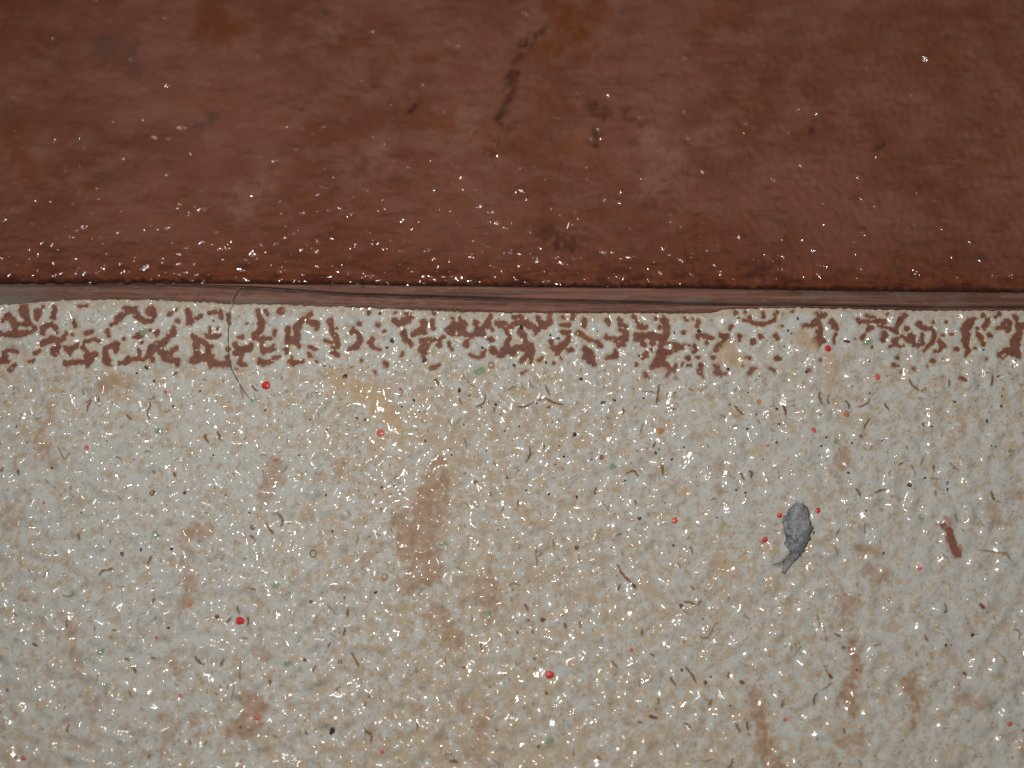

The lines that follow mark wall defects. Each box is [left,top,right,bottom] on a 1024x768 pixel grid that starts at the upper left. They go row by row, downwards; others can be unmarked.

crack [227,287,256,400]
peeling [0,304,794,367]
peeling [804,311,839,362]
peeling [854,311,1024,366]
rust [933,514,964,560]